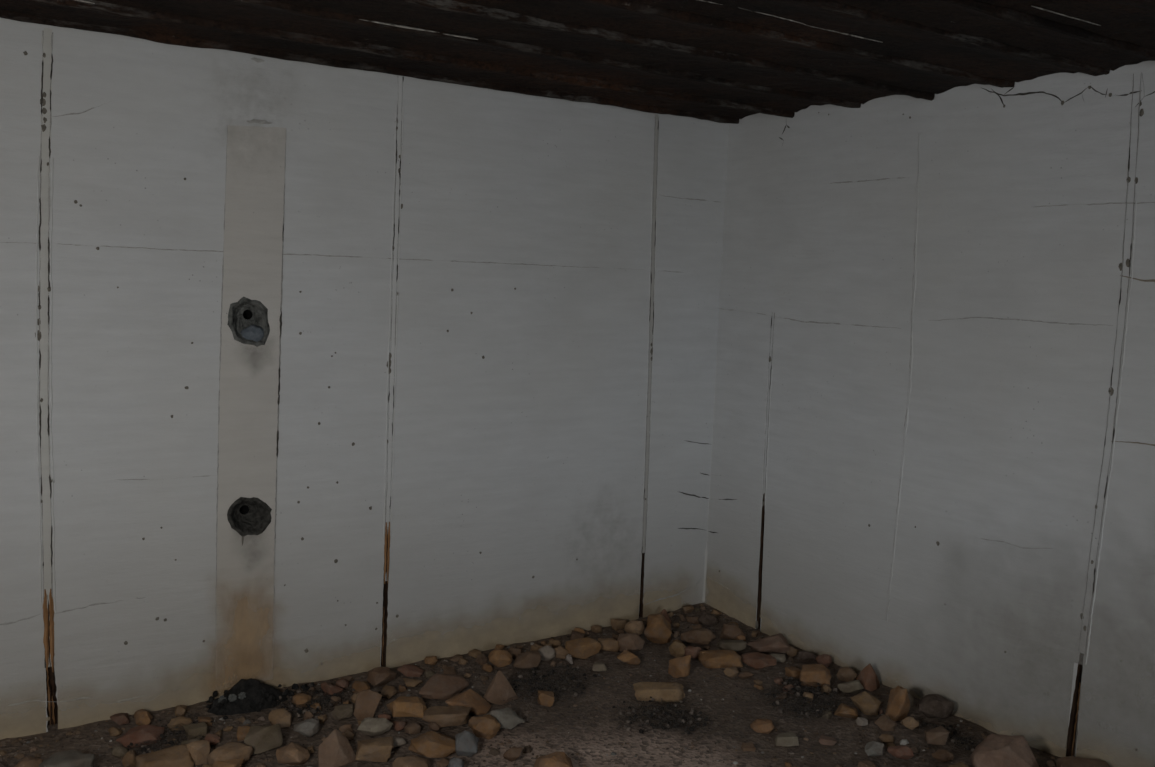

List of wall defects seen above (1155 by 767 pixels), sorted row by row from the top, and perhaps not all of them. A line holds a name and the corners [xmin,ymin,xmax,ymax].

crack [680,74,1155,757]